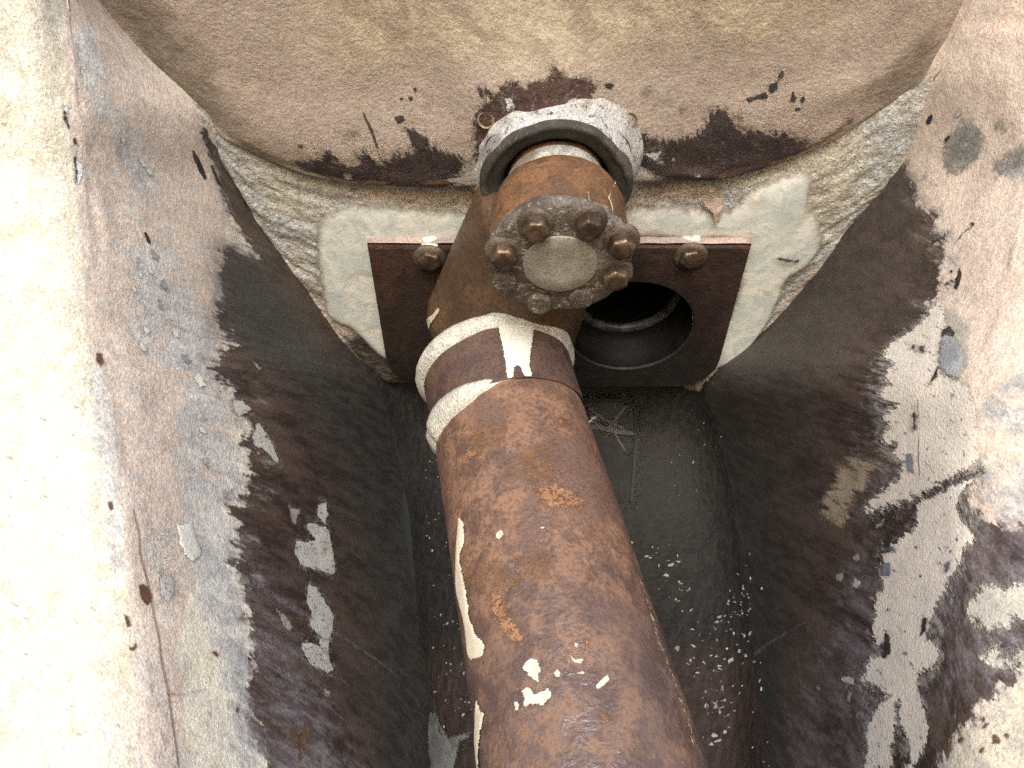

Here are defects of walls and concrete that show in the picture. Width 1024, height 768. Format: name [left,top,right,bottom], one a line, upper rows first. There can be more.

peeling [131,232,168,310]
peeling [180,353,206,388]
peeling [233,399,251,417]
peeling [252,423,279,462]
peeling [288,502,335,575]
rust [534,482,585,510]
peeling [820,267,984,768]
peeling [301,584,334,674]
rust [488,589,524,645]
peeling [966,577,1024,671]
peeling [514,658,551,711]